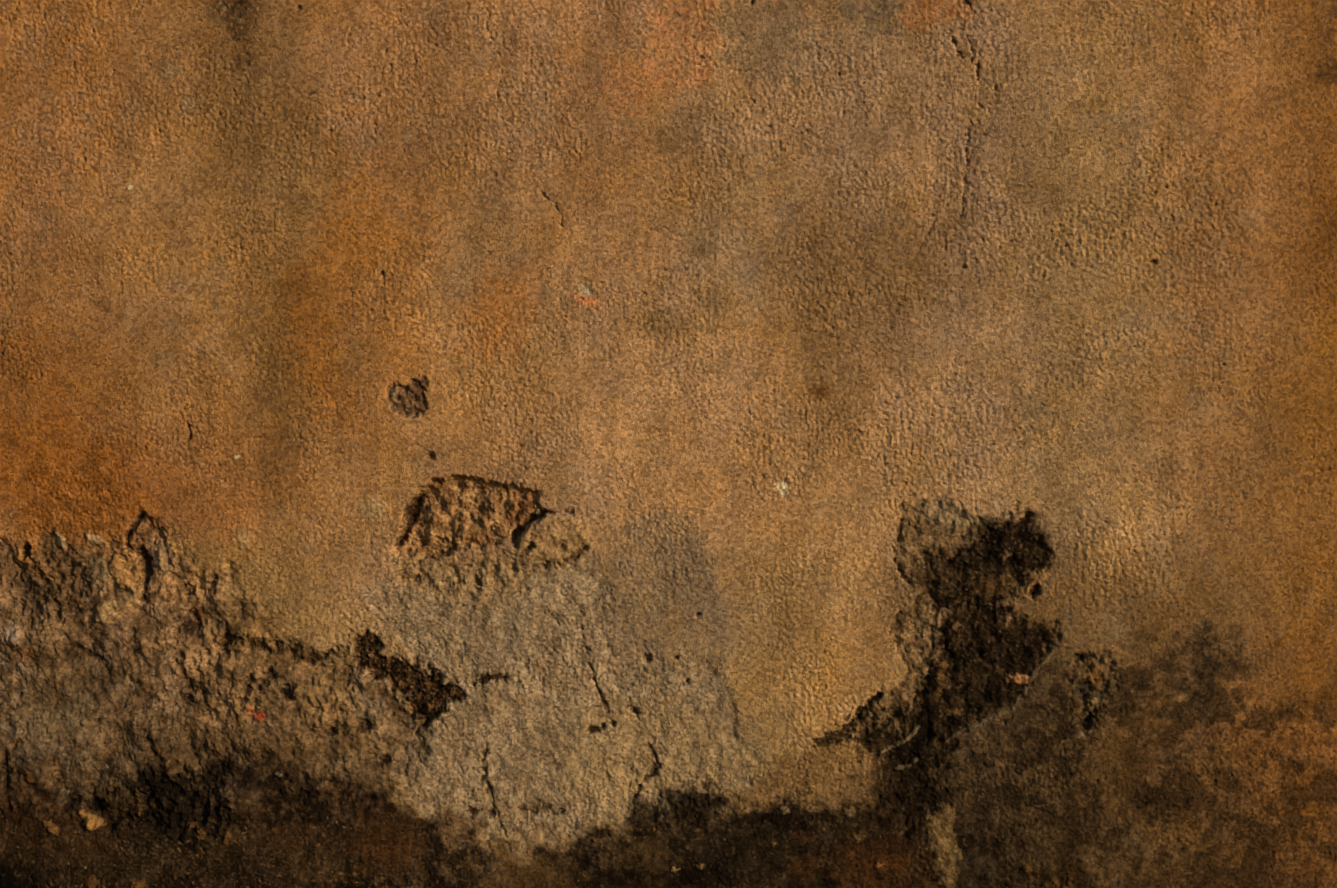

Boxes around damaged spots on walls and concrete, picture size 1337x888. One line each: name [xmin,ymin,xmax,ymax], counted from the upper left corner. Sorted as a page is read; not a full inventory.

peeling [597,0,719,120]
spalling [386,375,429,419]
spalling [0,436,787,849]
damp [0,616,1337,888]
spalling [810,495,1128,888]